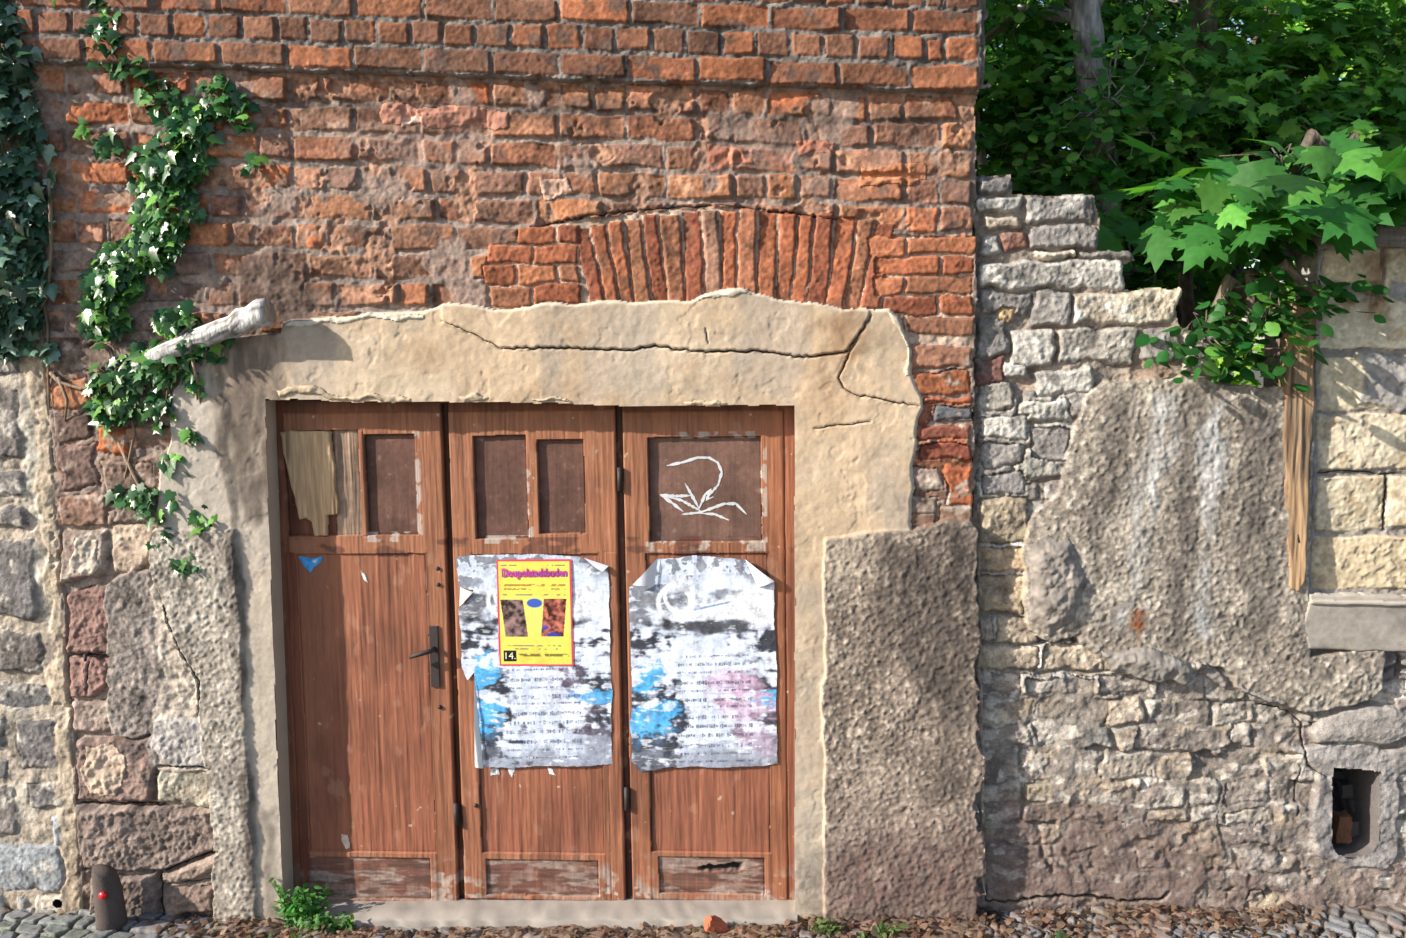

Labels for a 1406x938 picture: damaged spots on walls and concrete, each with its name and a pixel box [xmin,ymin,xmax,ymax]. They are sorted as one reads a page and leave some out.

crack [444,318,918,429]
leakage [215,342,280,584]
crack [154,583,200,714]
flaking render [1099,646,1287,706]
crack [1257,703,1325,815]
spalling [1332,810,1353,844]
crack [984,881,1168,903]